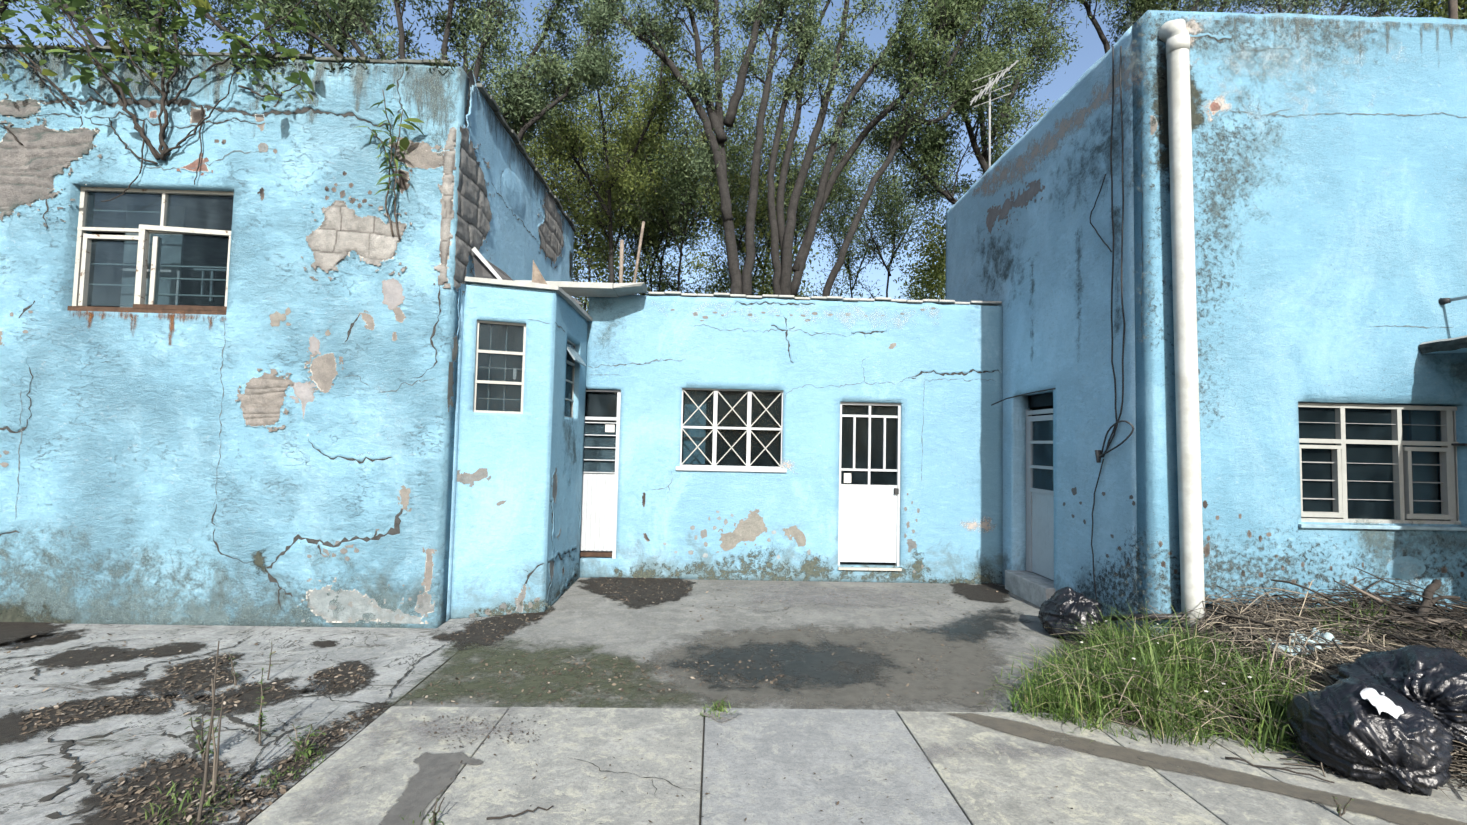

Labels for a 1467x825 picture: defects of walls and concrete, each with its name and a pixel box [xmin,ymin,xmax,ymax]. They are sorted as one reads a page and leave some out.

spalling [0,93,103,227]
leakage [974,12,1467,326]
crack [1223,109,1467,118]
spalling [301,124,495,342]
rust [73,310,136,330]
rust [158,312,226,345]
spalling [235,330,344,432]
crack [695,298,1002,481]
leakage [0,542,273,626]
crack [0,322,444,825]
peeling [643,509,817,559]
leakage [1203,522,1467,608]